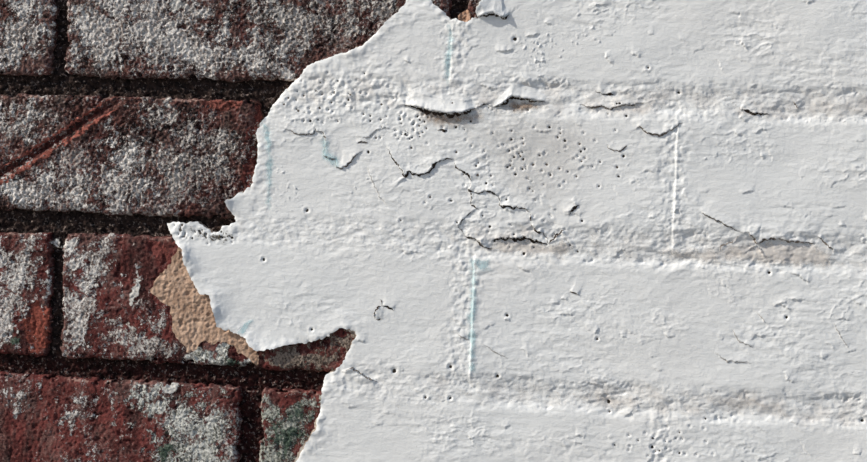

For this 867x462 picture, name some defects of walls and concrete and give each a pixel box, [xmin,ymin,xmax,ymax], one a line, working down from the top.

leakage [0,0,399,82]
leakage [0,97,272,215]
spalling [202,99,262,187]
crack [286,128,383,198]
peeling [394,83,546,149]
crack [388,149,579,249]
crack [704,214,833,250]
spalling [23,300,51,355]
leakage [0,233,356,372]
peeling [150,224,259,366]
leakage [55,380,240,462]
leakage [259,392,321,462]